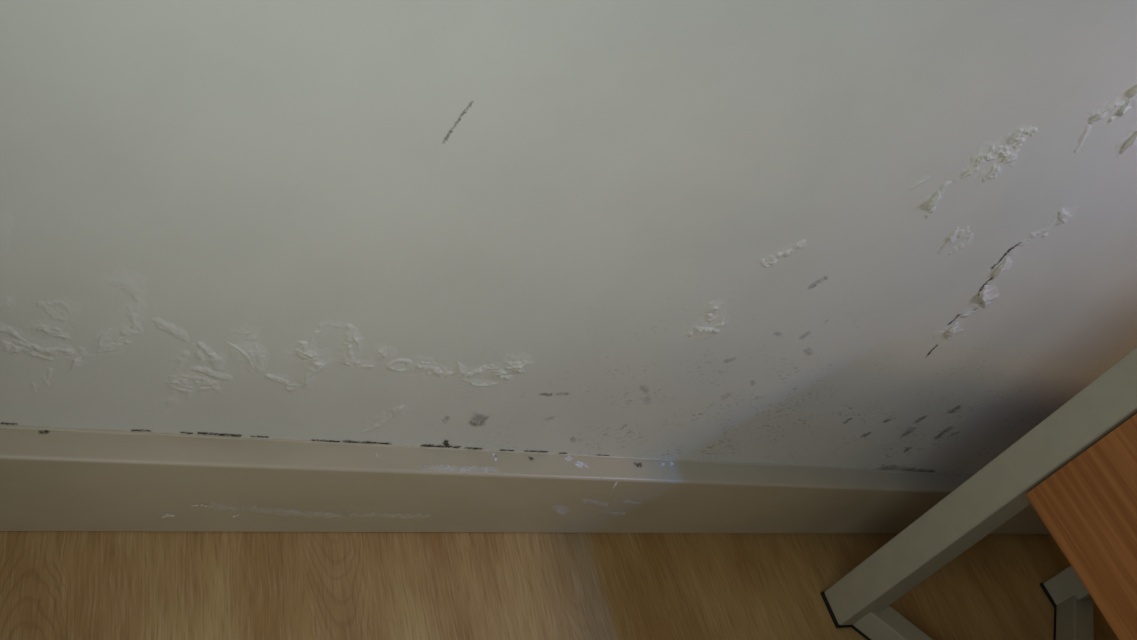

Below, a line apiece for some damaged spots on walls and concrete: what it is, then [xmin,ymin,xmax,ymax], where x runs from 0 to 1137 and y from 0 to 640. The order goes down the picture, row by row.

peeling [1074,78,1137,157]